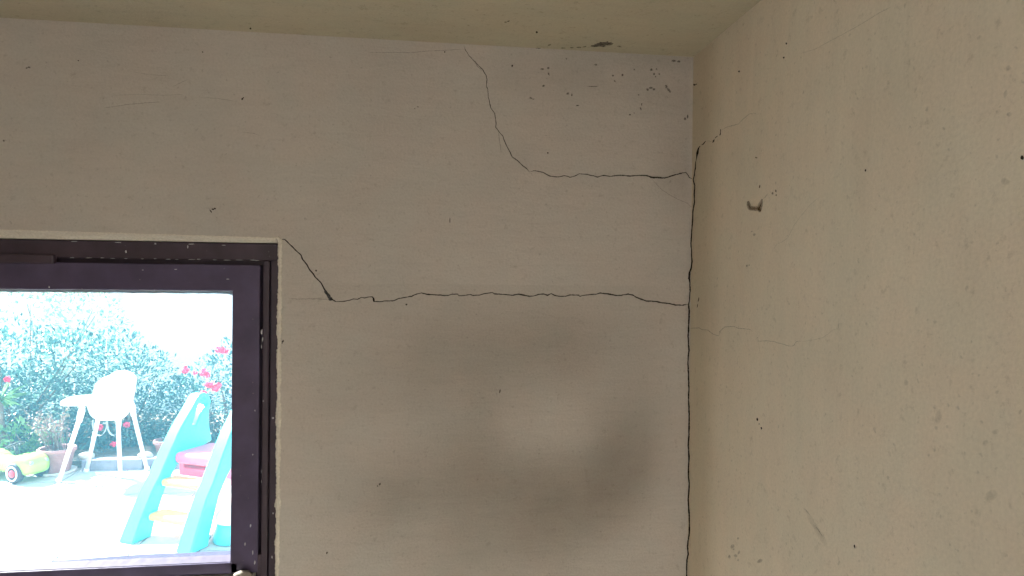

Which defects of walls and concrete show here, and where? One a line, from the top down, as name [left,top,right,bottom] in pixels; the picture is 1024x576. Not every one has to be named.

crack [282,49,721,576]